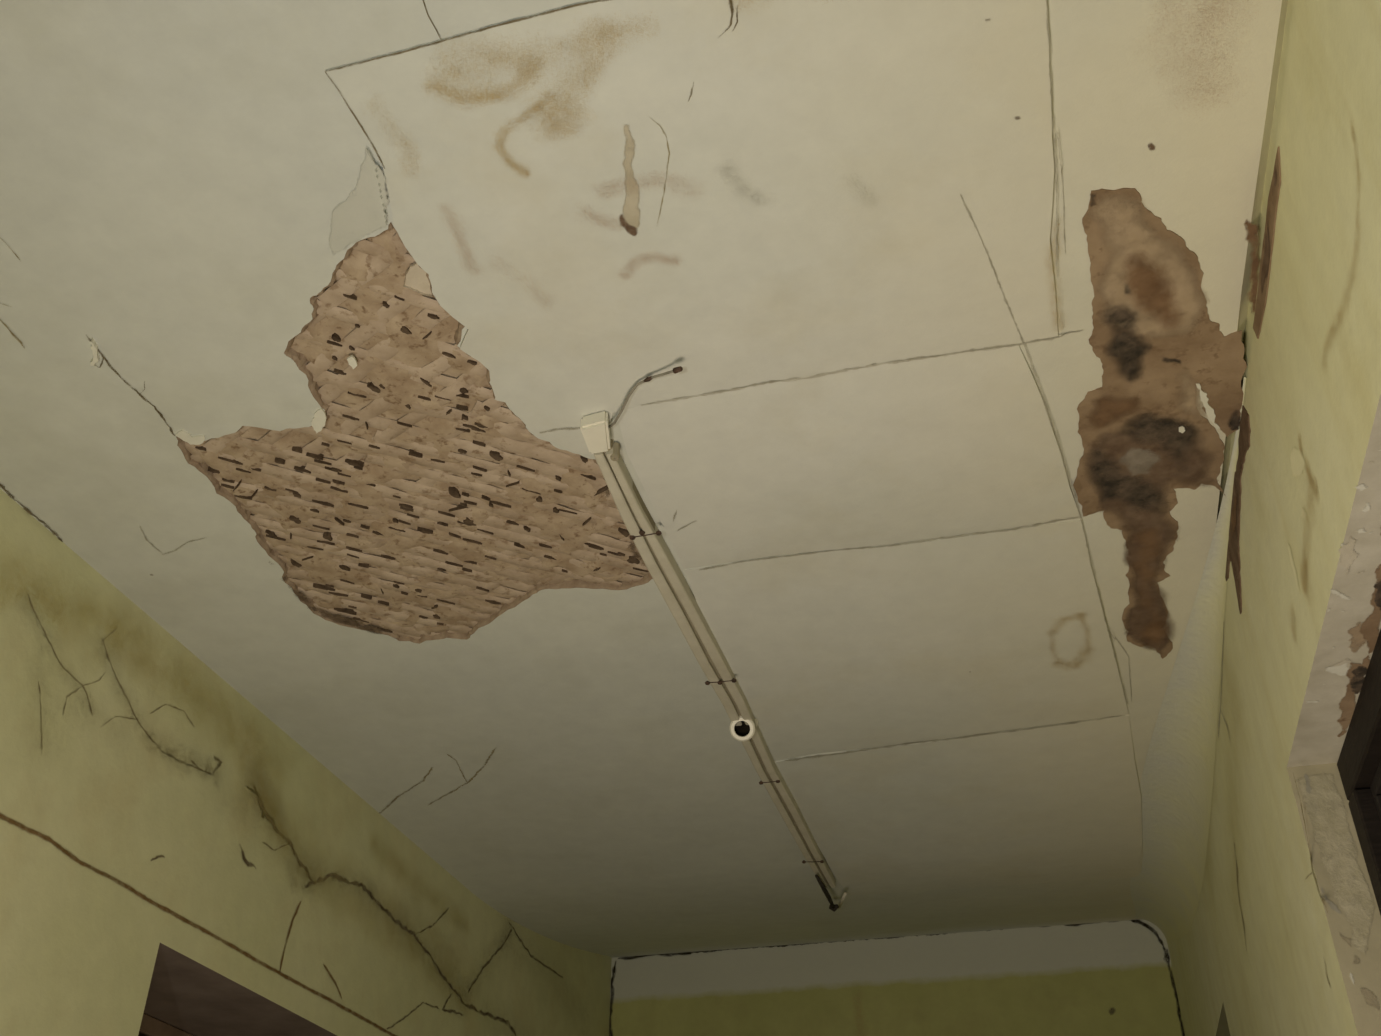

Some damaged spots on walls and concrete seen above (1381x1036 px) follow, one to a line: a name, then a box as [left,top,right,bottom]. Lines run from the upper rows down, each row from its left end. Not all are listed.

damp [419,10,661,177]
damp [576,125,704,236]
crack [0,303,24,348]
crack [86,335,174,435]
flaking render [175,222,653,643]
flaking render [1073,146,1281,659]
crack [28,595,222,775]
flaking render [1325,484,1381,737]
crack [381,748,496,813]
crack [0,787,563,1036]
crack [609,933,952,1036]